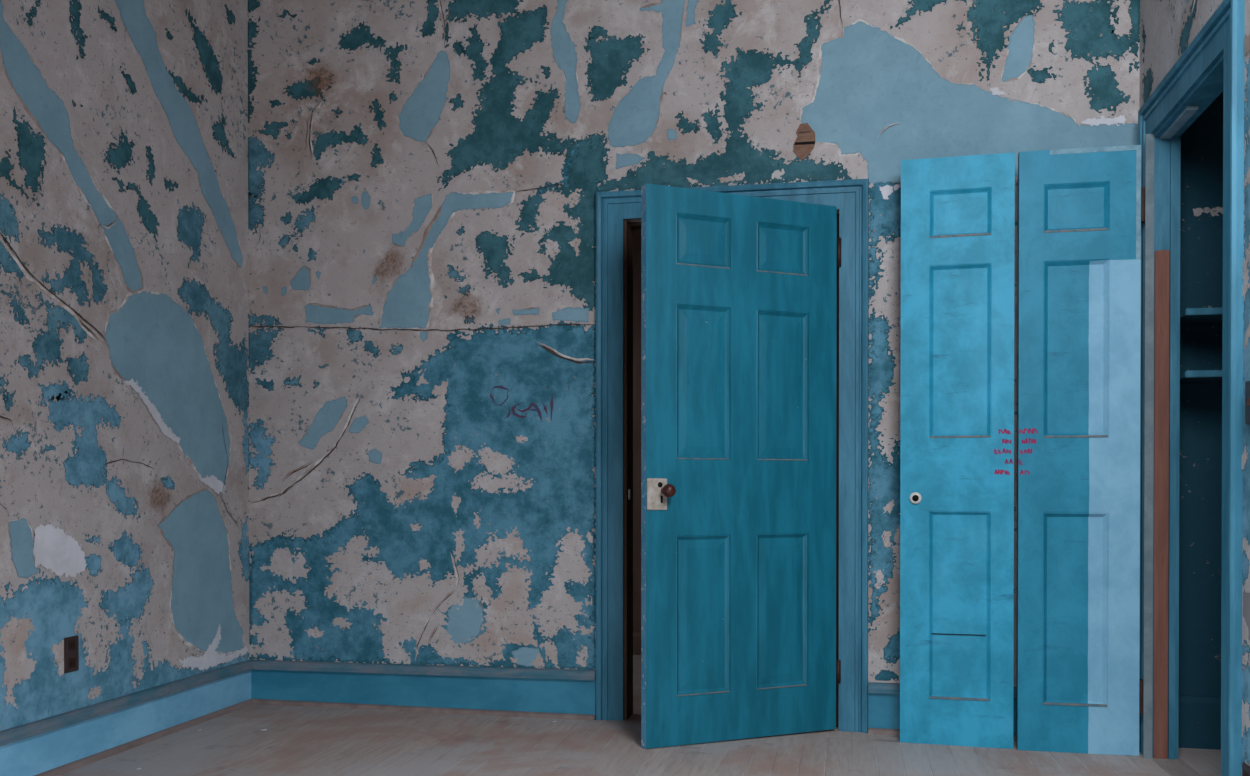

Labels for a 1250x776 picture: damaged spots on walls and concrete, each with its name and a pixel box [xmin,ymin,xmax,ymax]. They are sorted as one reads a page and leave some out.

peeling [248,0,295,235]
peeling [338,22,407,84]
peeling [584,25,650,102]
peeling [699,0,742,56]
peeling [956,0,1057,83]
peeling [1053,0,1153,118]
crack [0,233,108,345]
peeling [0,0,284,523]
crack [252,323,593,364]
peeling [379,190,516,342]
crack [222,394,362,527]
peeling [868,307,900,632]